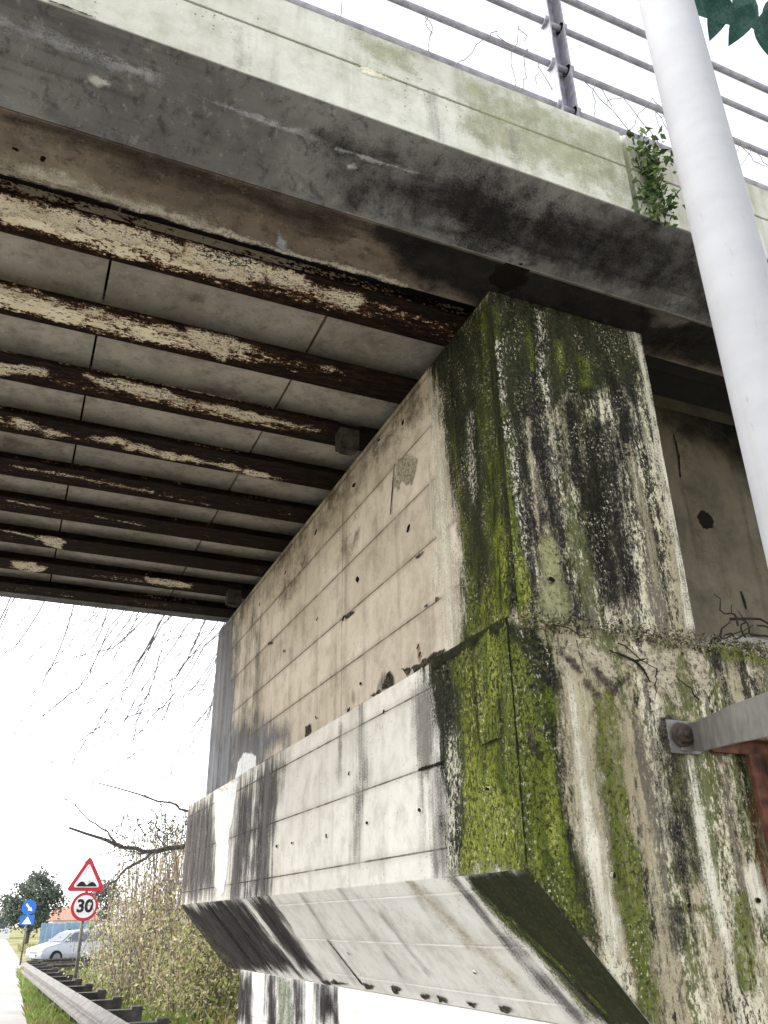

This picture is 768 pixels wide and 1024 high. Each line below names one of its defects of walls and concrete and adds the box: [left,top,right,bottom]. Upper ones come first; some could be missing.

leakage [0,16,164,84]
peeling [0,193,367,312]
peeling [0,362,53,379]
peeling [11,417,72,439]
peeling [87,435,287,480]
peeling [82,373,321,432]
peeling [146,323,267,362]
leakage [0,101,744,648]
leakage [180,602,338,1024]
leakage [411,681,609,1024]
leakage [561,651,628,958]
leakage [639,740,735,987]